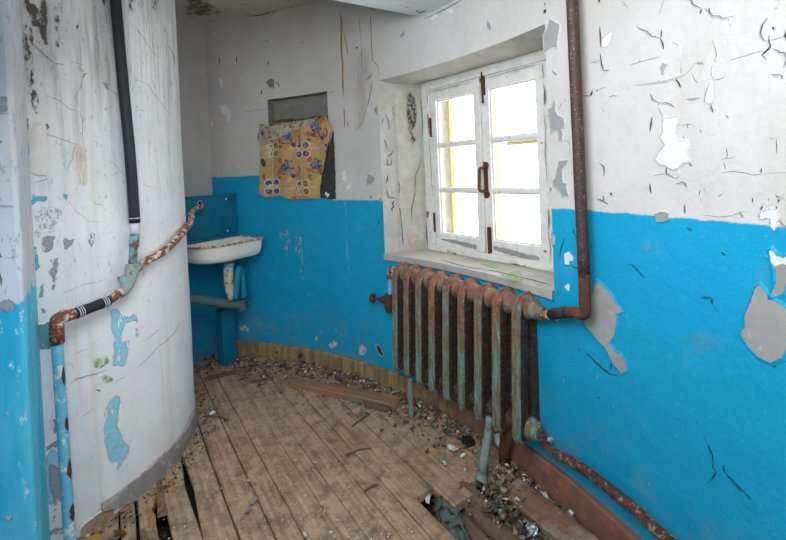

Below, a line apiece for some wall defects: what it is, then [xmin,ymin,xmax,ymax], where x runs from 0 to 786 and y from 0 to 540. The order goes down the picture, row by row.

rust [340,15,348,92]
crack [377,82,469,244]
crack [488,32,611,176]
peeling [542,17,561,55]
peeling [547,98,566,143]
peeling [549,159,570,199]
peeling [653,114,693,172]
crack [632,0,786,141]
crack [649,161,786,231]
peeling [581,278,629,377]
peeling [737,245,786,366]
crack [705,440,751,499]